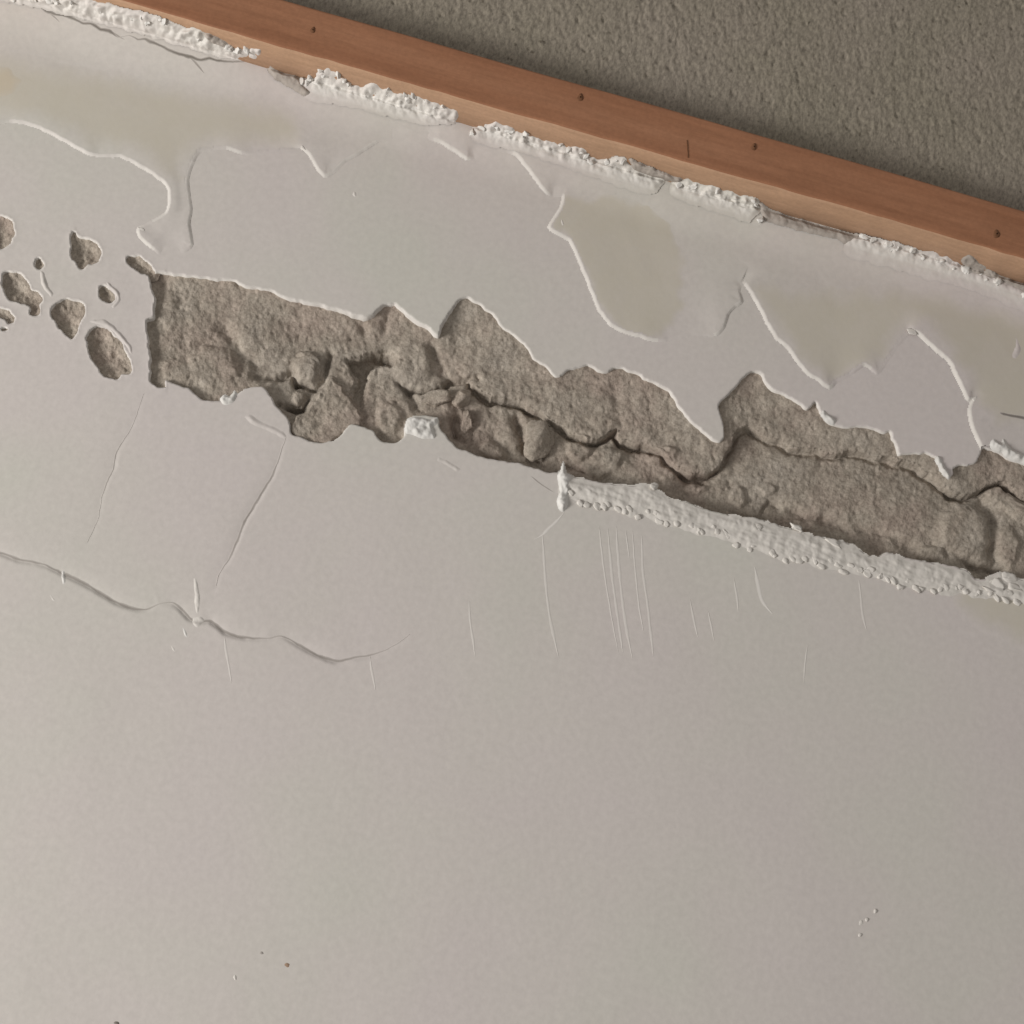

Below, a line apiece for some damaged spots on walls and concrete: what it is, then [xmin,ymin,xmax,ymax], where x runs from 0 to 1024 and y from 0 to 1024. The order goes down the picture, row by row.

flaking render [0,0,261,60]
flaking render [0,66,1024,606]
crack [87,394,144,542]
crack [0,440,406,663]